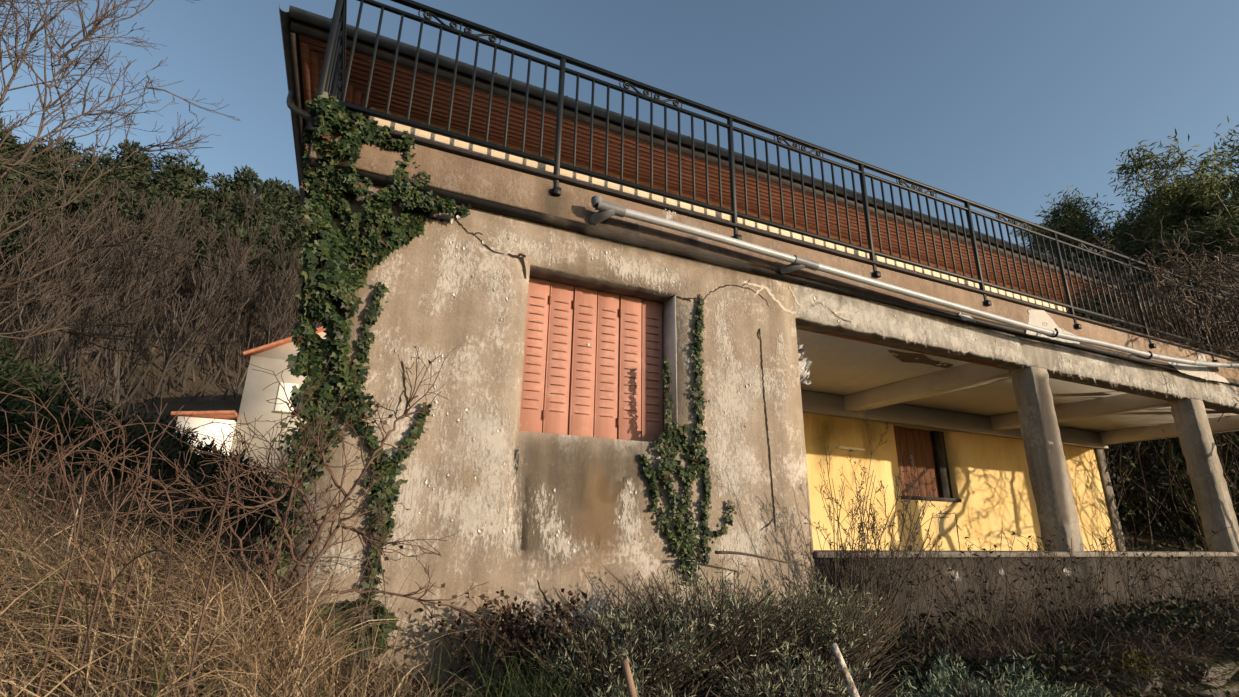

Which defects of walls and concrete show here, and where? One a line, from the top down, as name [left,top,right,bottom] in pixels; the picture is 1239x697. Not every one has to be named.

crack [430,213,526,278]
crack [675,279,851,532]
water stain [533,450,641,553]